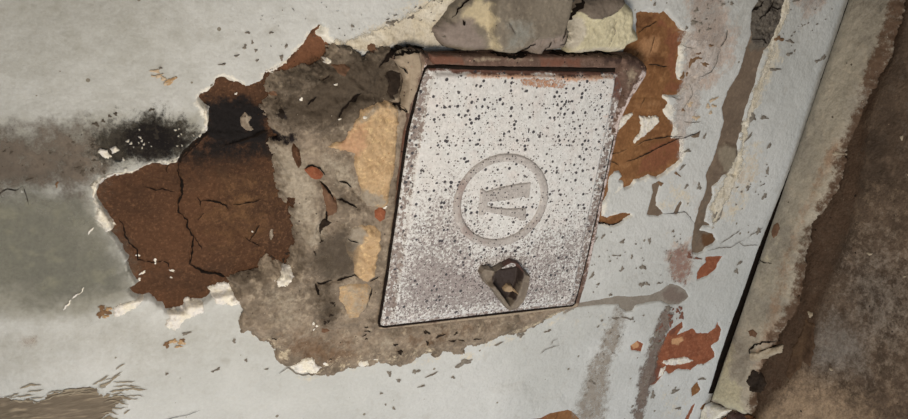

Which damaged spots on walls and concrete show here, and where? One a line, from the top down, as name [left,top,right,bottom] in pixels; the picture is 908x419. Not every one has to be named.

flaking render [594,0,826,279]
flaking render [55,0,455,349]
crack [119,131,267,277]
peeling [589,238,663,293]
peeling [0,364,148,419]
peeling [290,357,332,374]
flaking render [537,410,590,419]
flaking render [631,306,721,408]
flaking render [675,377,706,419]